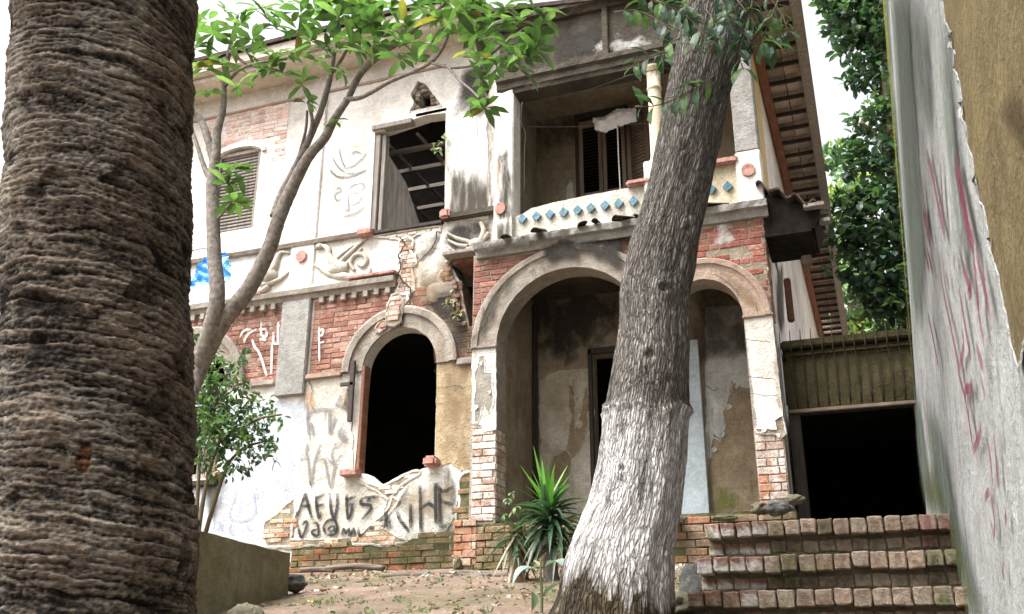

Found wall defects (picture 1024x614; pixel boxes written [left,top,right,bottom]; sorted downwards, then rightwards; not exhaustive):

water stain [446,150,631,268]
spalling [372,225,441,334]
water stain [534,292,618,364]
spalling [351,469,423,547]
flaking render [435,355,494,556]
peeling [705,306,787,513]